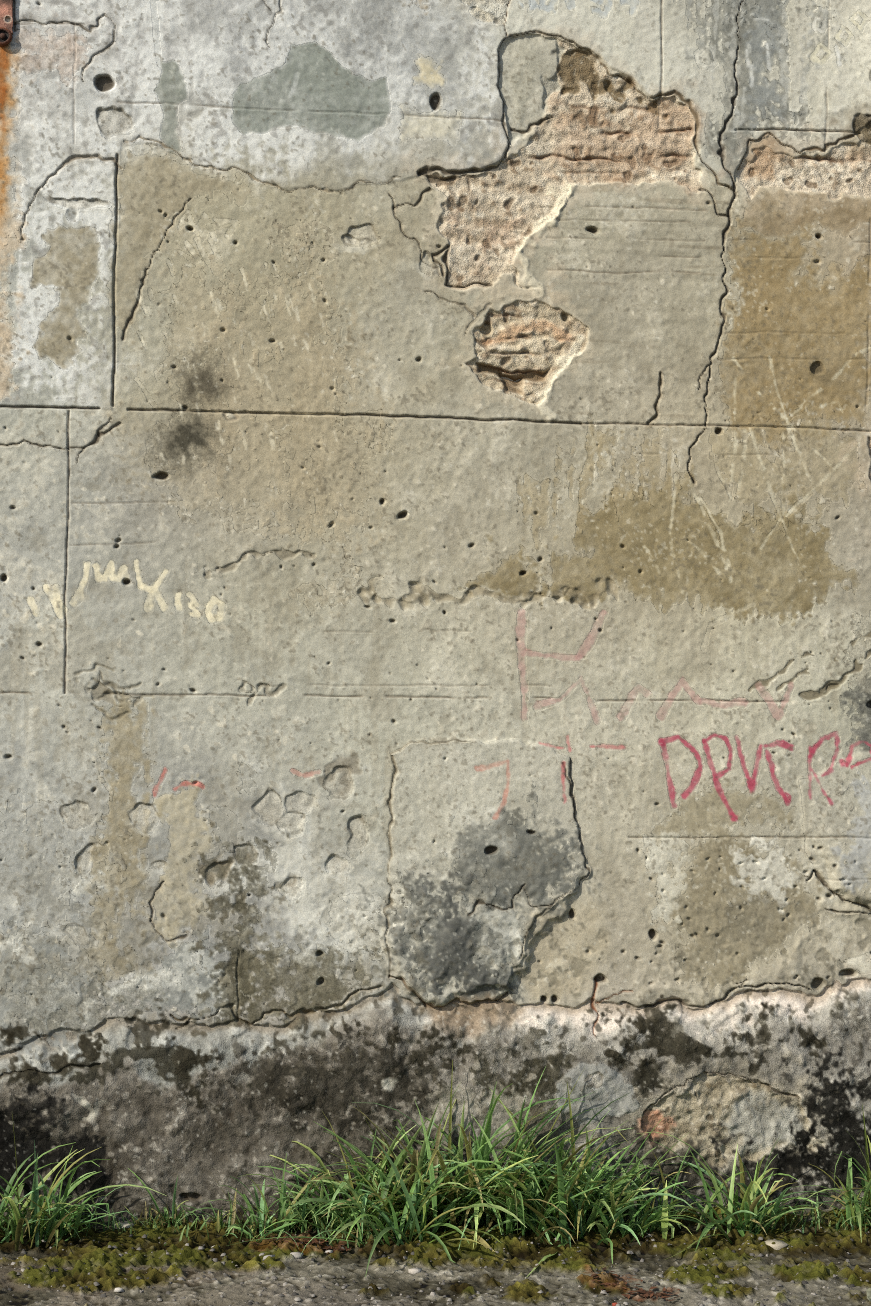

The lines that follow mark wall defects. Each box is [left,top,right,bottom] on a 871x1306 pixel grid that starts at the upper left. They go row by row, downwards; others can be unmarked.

rust [0,28,92,403]
crack [0,0,857,486]
spalling [420,0,703,405]
water stain [674,0,811,182]
spalling [736,114,871,201]
water stain [457,187,871,625]
water stain [840,611,871,747]
crack [44,1063,103,1077]
crack [171,1015,189,1030]
water stain [0,689,581,1225]
crack [591,979,806,1035]
crack [806,870,871,915]